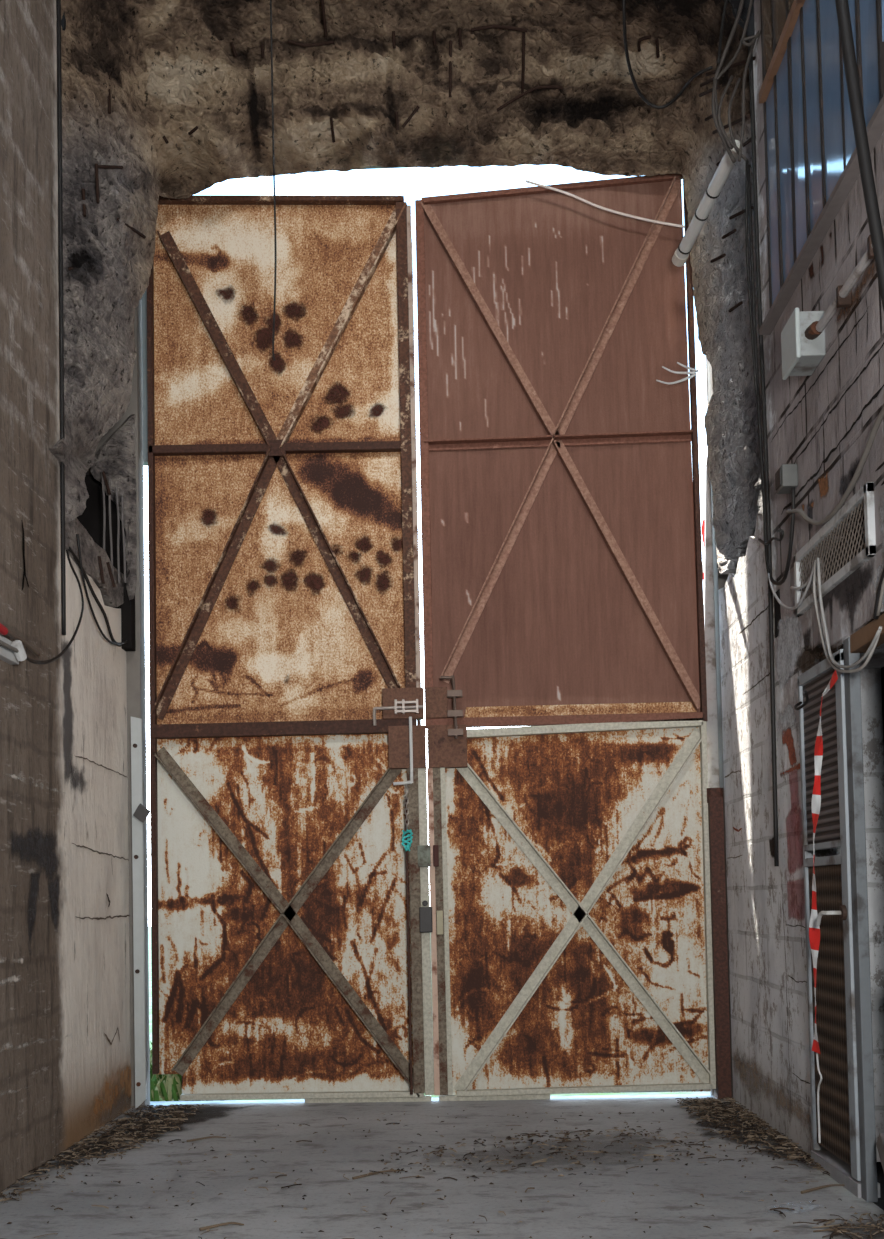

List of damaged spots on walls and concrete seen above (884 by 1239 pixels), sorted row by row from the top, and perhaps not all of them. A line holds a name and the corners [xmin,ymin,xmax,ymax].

spalling [49,0,763,651]